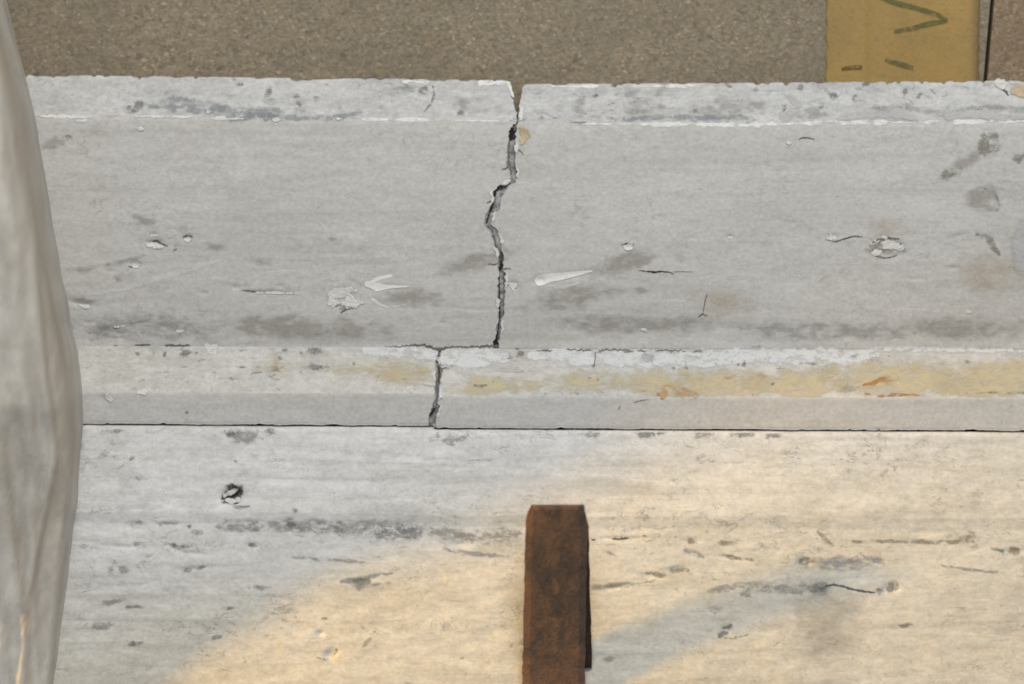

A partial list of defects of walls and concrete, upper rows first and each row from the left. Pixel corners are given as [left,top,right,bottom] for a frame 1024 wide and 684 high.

spalling [825,232,905,259]
crack [385,106,699,428]
spalling [327,284,365,313]
peeling [223,488,241,504]